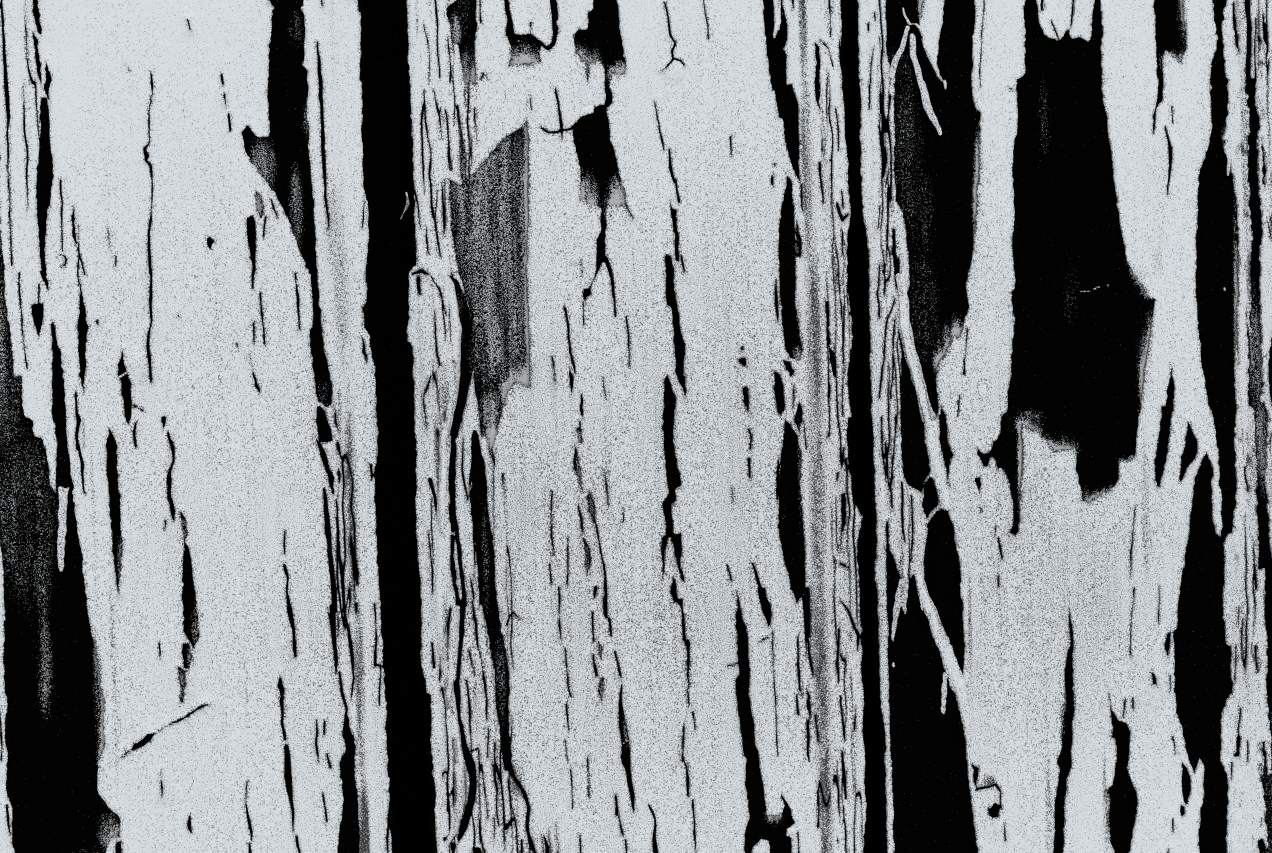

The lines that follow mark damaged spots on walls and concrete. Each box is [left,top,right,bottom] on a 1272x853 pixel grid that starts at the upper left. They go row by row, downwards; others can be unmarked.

peeling [0,230,120,853]
crack [245,782,253,853]
peeling [242,0,338,494]
crack [278,442,388,853]
crack [504,0,558,66]
peeling [444,0,633,853]
crack [549,306,658,853]
crack [662,2,684,71]
crack [654,102,696,851]
peeling [881,0,1006,853]
peeling [975,0,1155,535]
peeling [1165,0,1272,853]